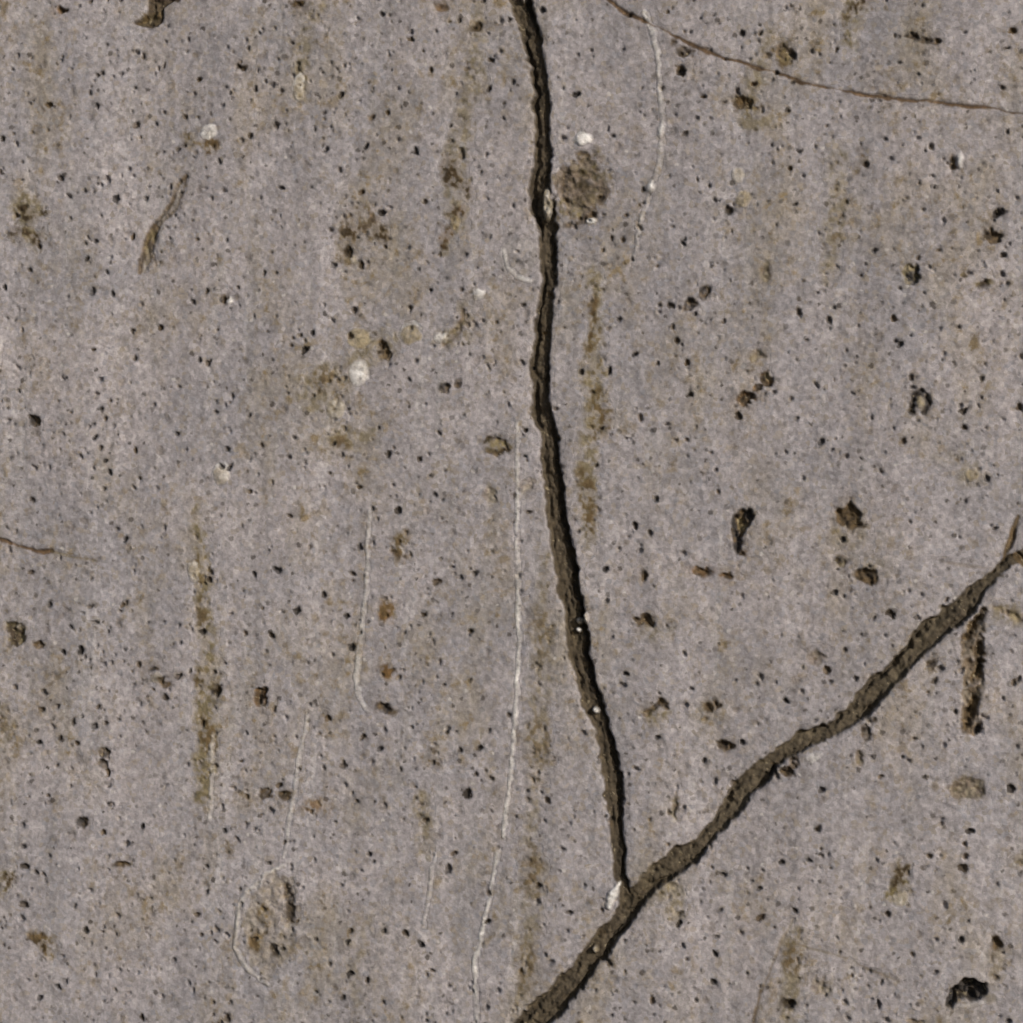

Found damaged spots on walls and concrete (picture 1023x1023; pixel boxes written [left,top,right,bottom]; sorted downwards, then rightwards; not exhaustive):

crack [0,535,94,564]
crack [503,0,1023,1023]